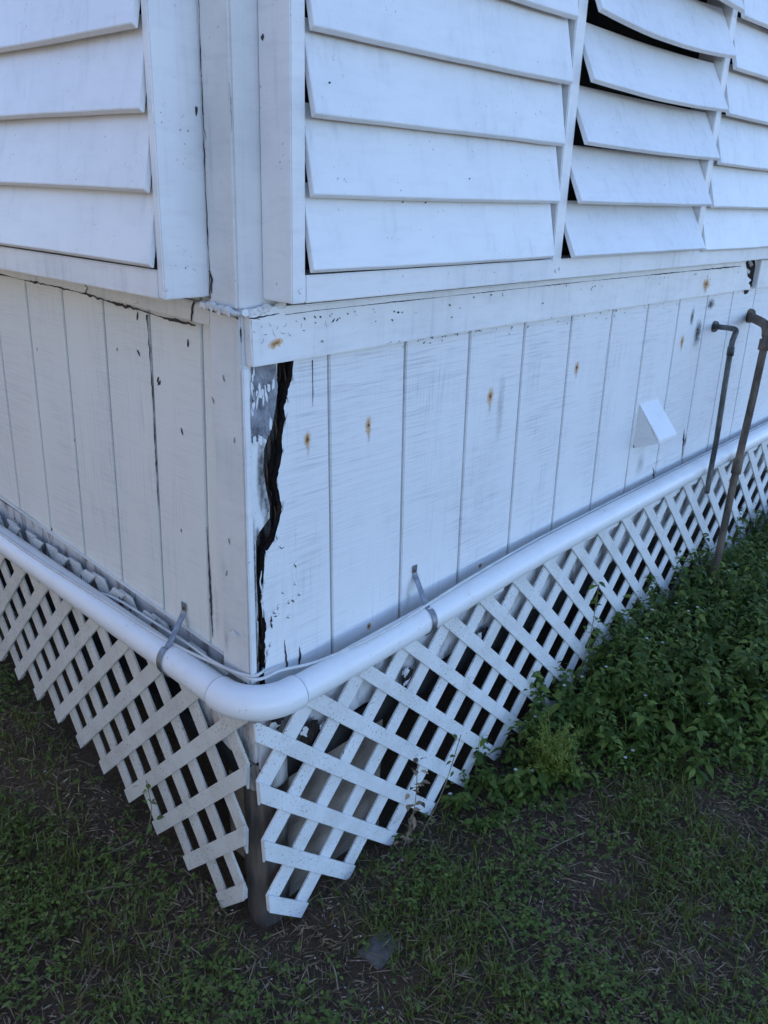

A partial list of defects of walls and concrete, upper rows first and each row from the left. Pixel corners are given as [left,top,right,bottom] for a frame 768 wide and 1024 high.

crack [0,0,213,326]
peeling [250,364,290,445]
crack [284,640,301,667]